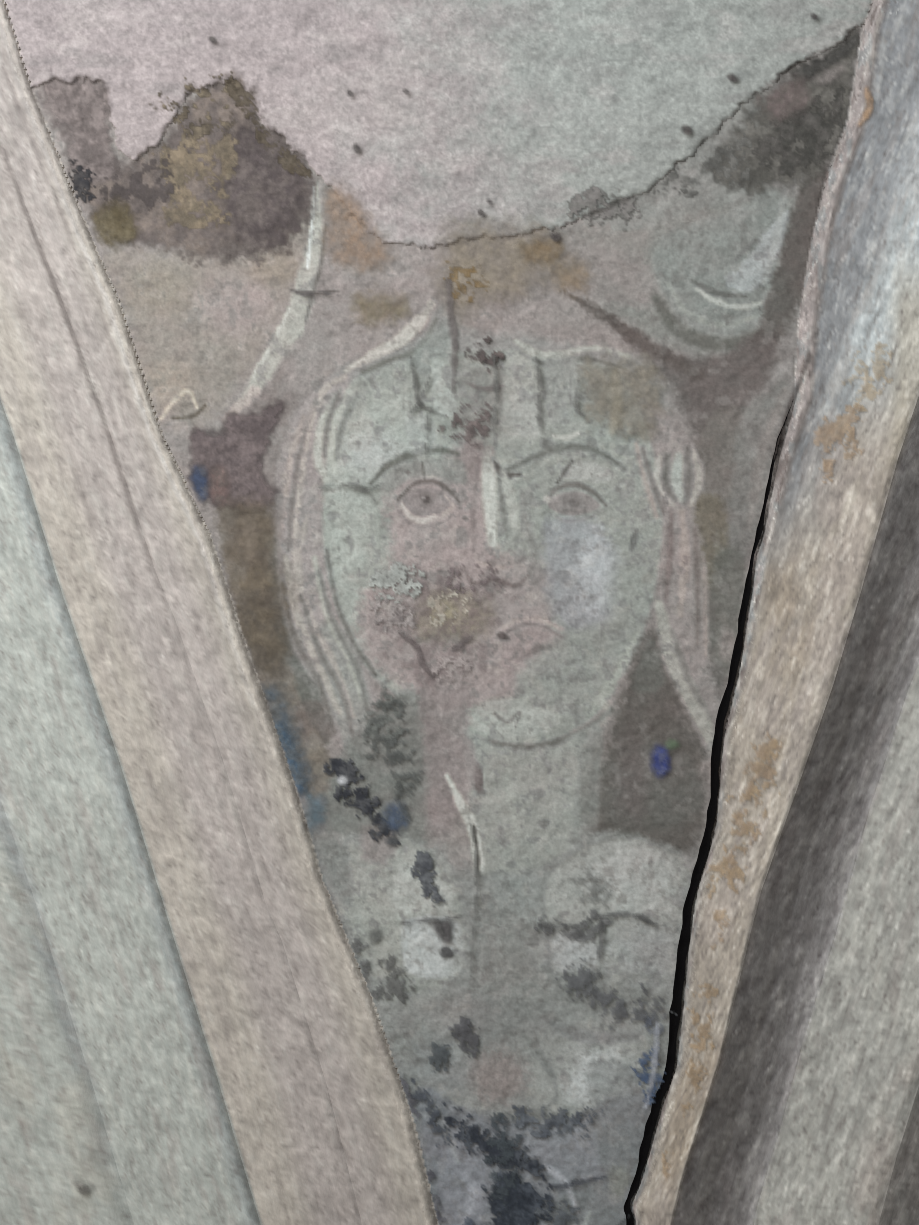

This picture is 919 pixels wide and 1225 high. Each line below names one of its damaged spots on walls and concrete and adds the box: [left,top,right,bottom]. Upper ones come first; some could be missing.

crack [538,353,810,1225]